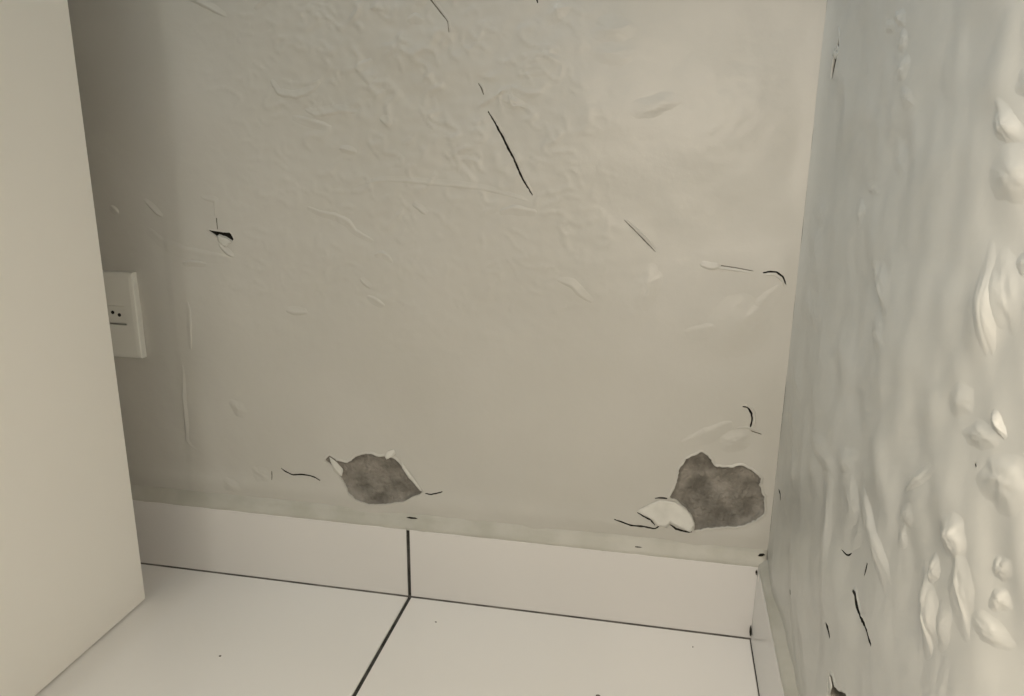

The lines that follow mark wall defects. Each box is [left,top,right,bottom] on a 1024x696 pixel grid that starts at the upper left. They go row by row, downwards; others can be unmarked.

crack [431,0,452,32]
crack [478,83,533,195]
crack [624,219,656,252]
spalling [323,450,442,507]
spalling [614,450,767,533]
crack [853,586,871,646]
spalling [827,671,848,696]